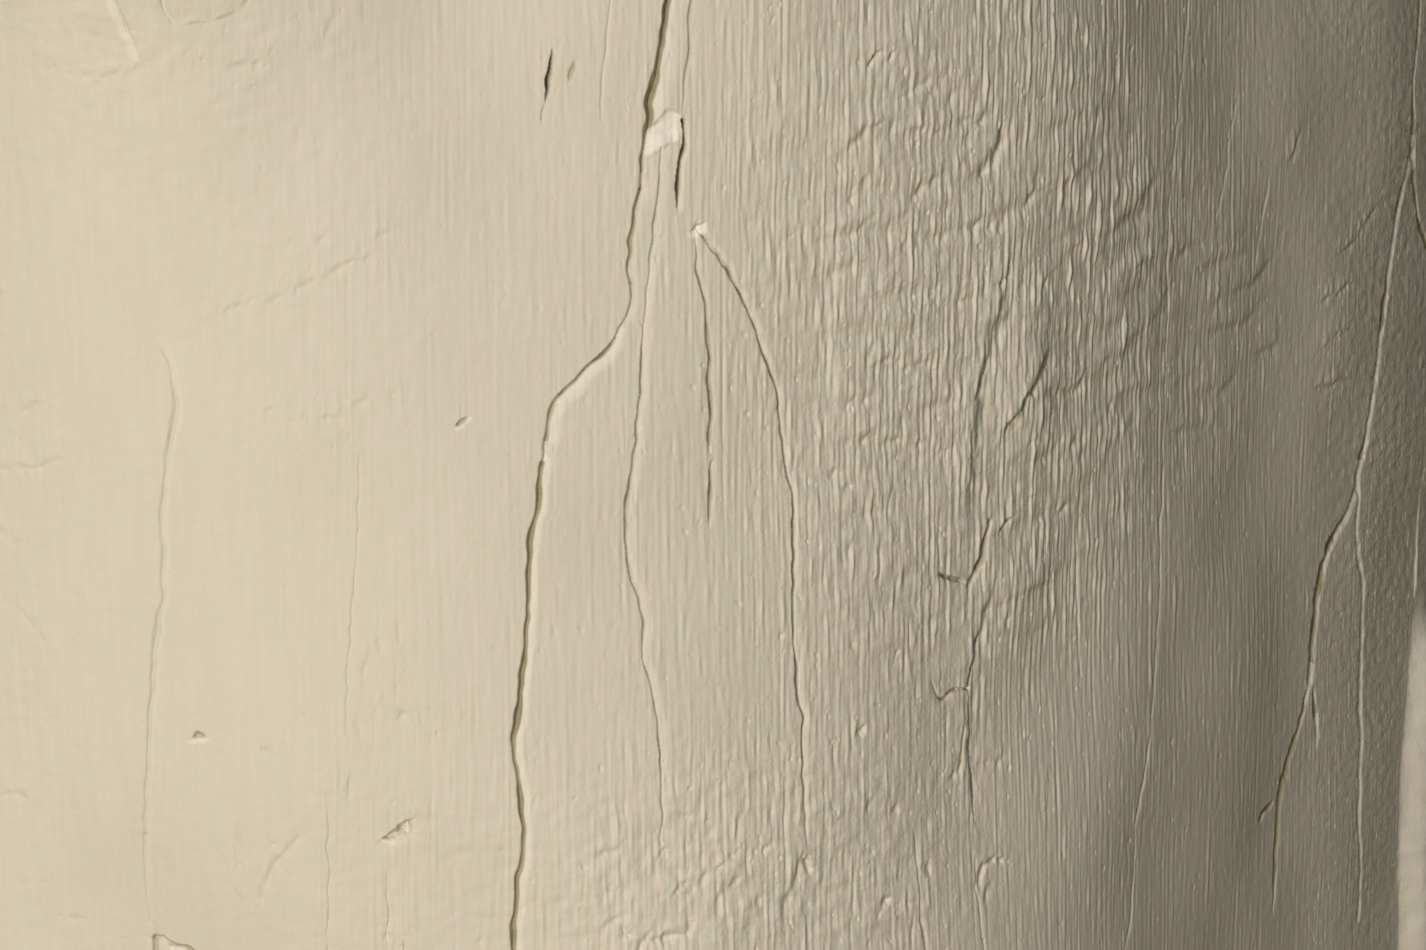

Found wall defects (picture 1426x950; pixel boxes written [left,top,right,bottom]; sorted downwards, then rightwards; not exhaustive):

crack [492,0,822,950]
crack [1252,0,1426,926]